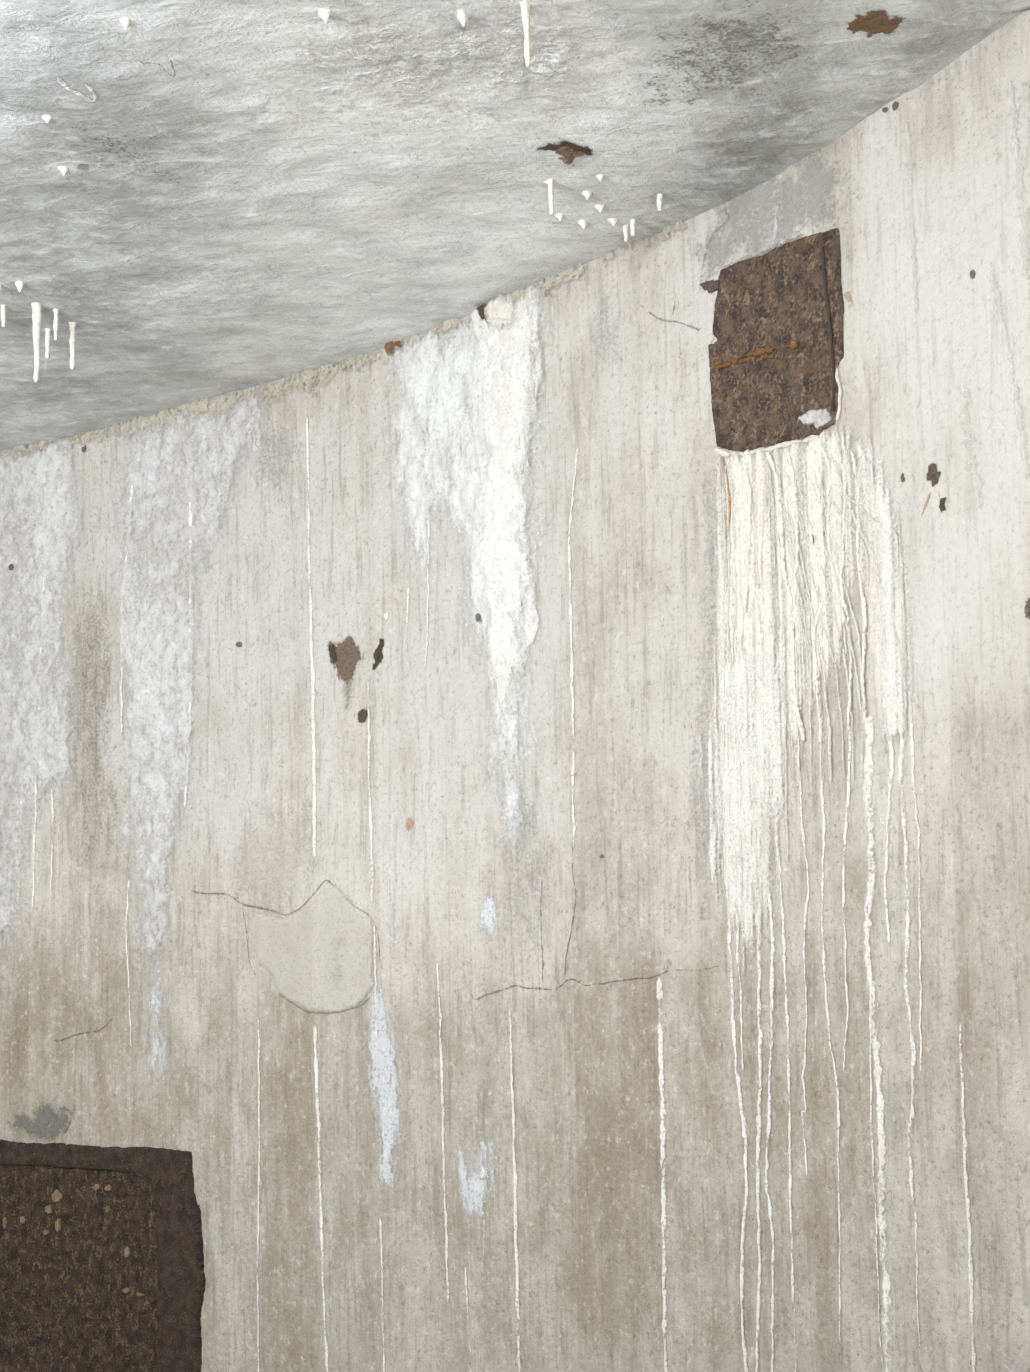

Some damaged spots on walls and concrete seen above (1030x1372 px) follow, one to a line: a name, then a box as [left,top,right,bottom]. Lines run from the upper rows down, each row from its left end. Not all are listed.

leakage [257,0,805,133]
corrosion [846,10,903,38]
corrosion [537,141,592,166]
leakage [0,220,686,1073]
corrosion [328,636,384,723]
crack [194,880,380,965]
leakage [696,430,922,1372]